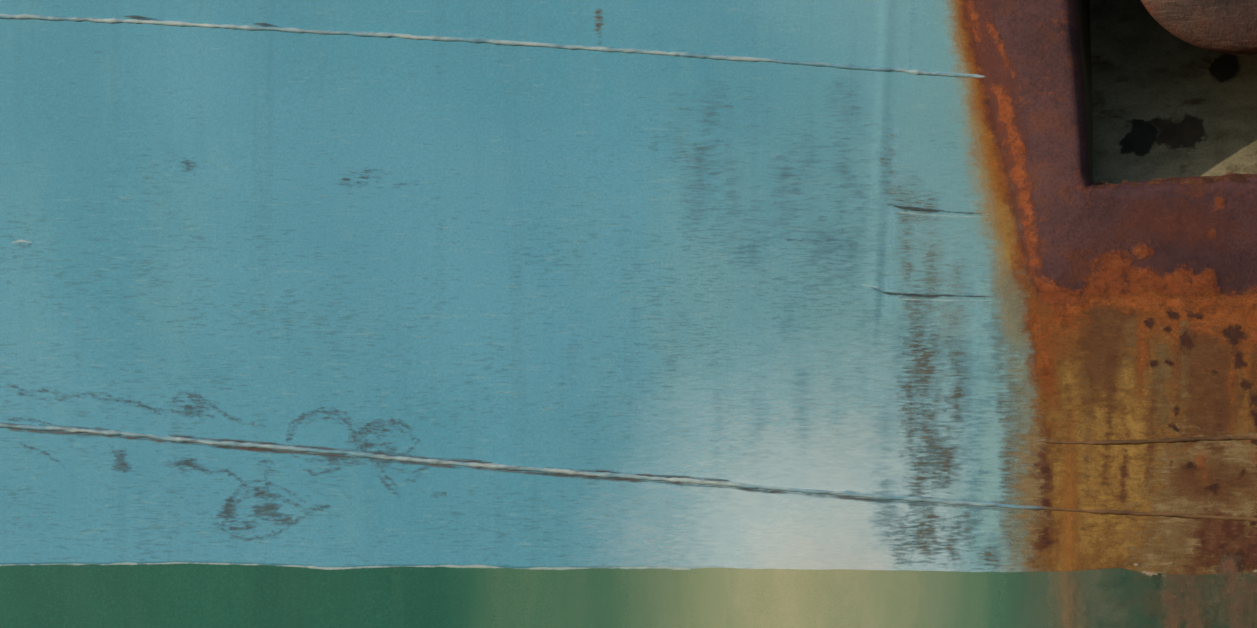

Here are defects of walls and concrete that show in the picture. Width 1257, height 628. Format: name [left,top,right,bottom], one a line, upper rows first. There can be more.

leakage [8,135,1257,628]
rust [952,0,1257,628]
peeling [1119,114,1207,157]
peeling [1208,53,1240,83]